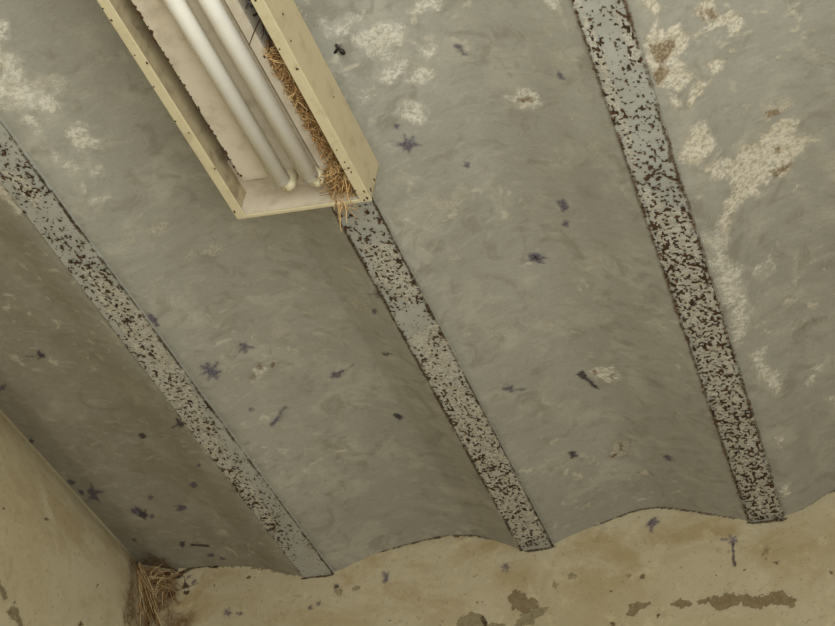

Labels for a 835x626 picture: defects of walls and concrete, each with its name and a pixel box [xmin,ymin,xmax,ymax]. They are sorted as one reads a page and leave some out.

flaking render [457,611,505,626]
flaking render [508,589,548,626]
flaking render [626,601,651,616]
flaking render [670,590,796,610]